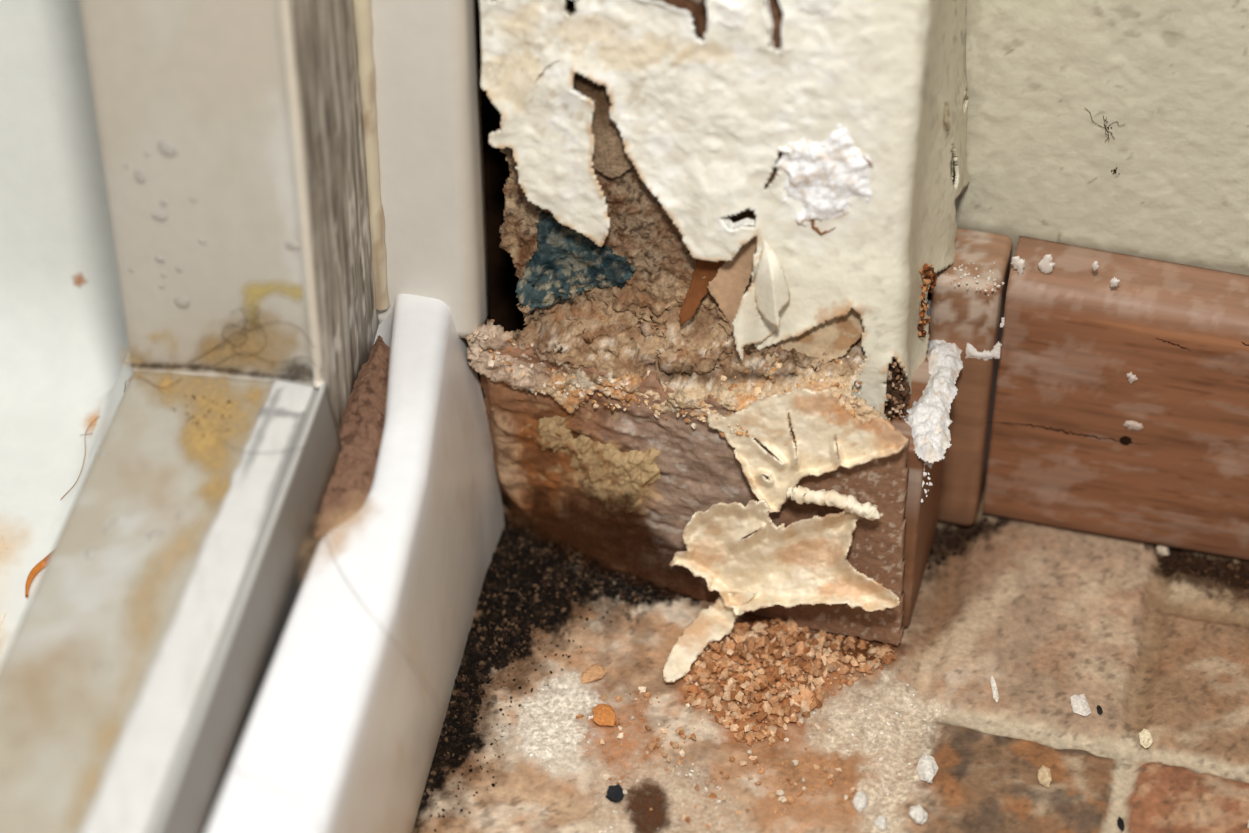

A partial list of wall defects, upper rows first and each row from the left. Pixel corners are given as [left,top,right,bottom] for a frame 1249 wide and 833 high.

spalling [655,0,708,40]
water stain [774,124,875,227]
water stain [947,262,1004,296]
spalling [465,147,909,683]
water stain [903,340,1002,502]